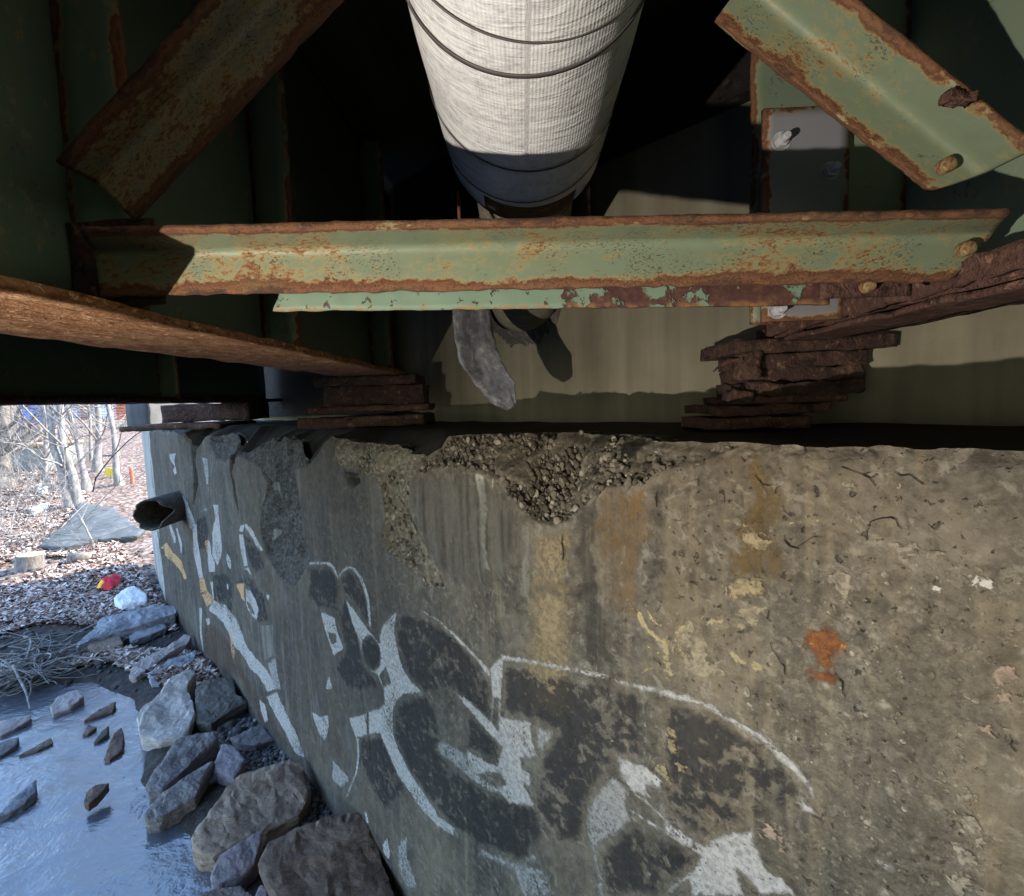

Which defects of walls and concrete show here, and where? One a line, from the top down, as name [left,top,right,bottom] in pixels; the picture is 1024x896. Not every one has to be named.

spalling [334,430,738,590]
corrosion [806,629,846,683]